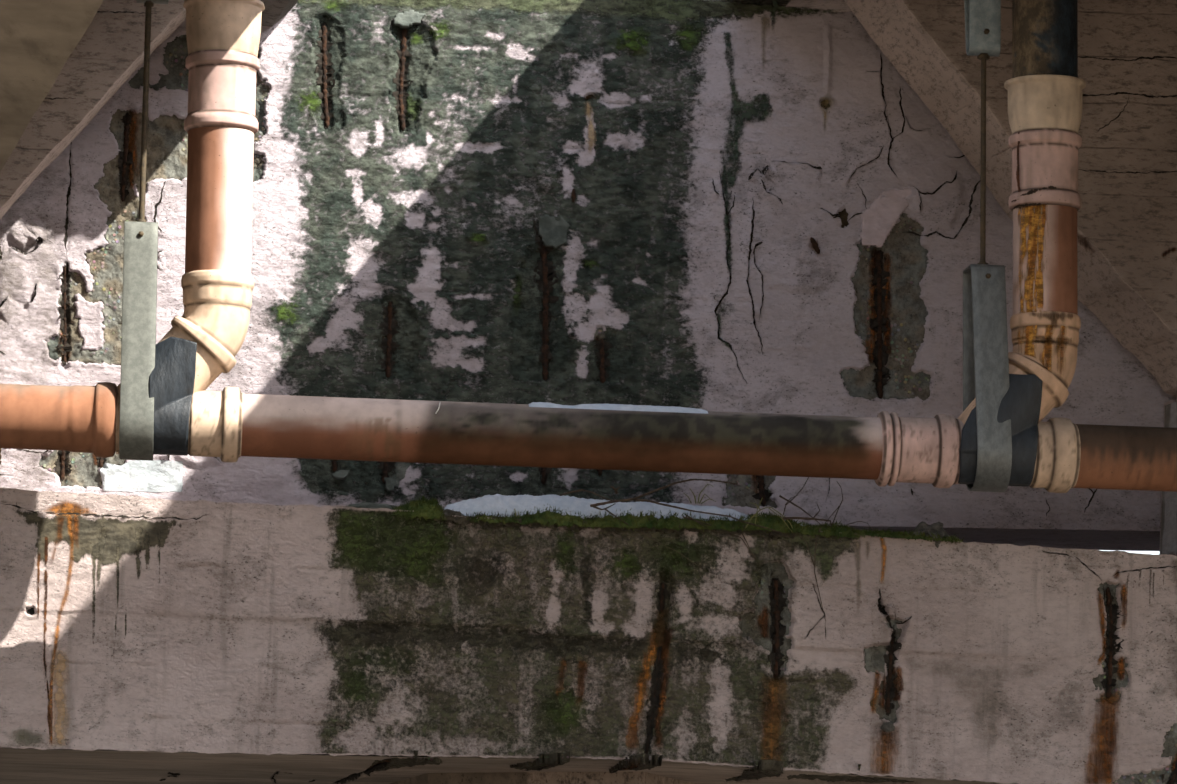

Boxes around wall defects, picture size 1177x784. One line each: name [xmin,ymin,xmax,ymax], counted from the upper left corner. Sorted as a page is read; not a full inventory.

crack [0,142,72,274]
spalling [45,109,188,366]
spalling [310,23,344,133]
spalling [388,10,436,137]
leakage [586,102,595,149]
crack [712,161,822,383]
spalling [838,188,931,401]
crack [820,55,980,239]
rust [49,502,89,745]
leakage [16,508,183,745]
rust [628,610,672,748]
rust [1086,695,1118,784]